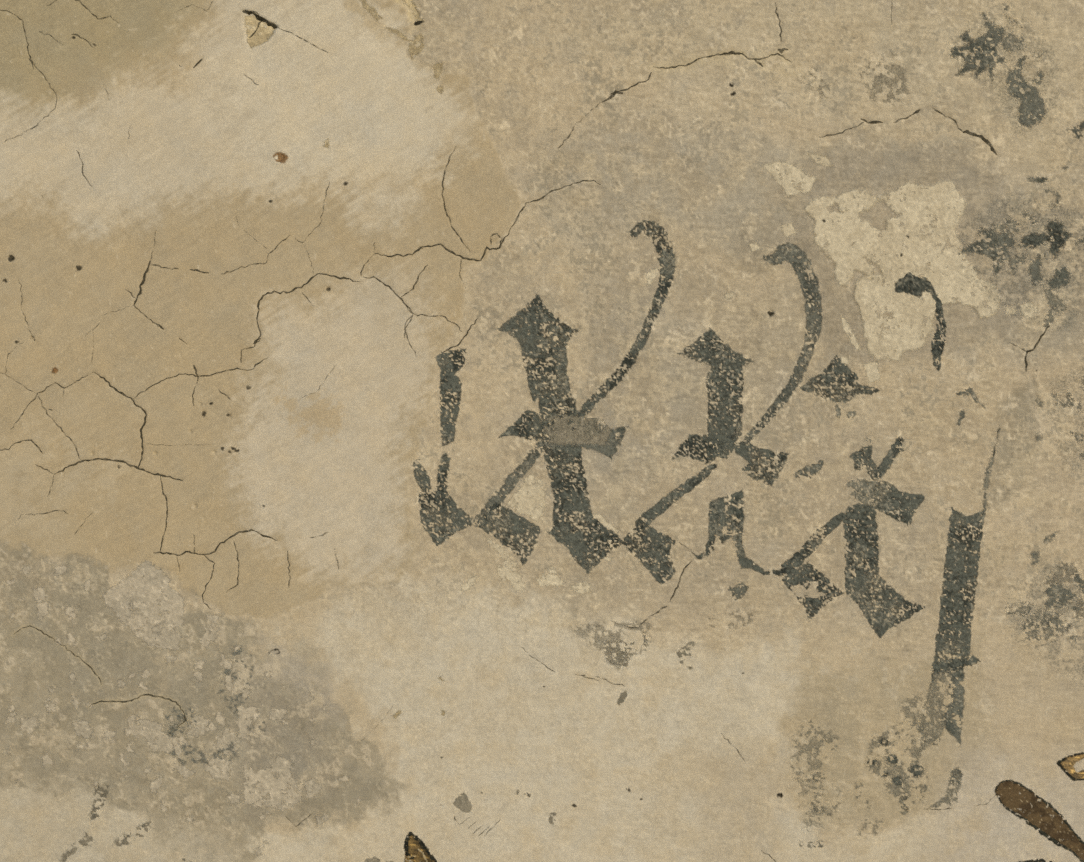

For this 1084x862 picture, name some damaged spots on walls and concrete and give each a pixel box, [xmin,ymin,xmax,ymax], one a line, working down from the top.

crack [242,10,327,52]
spalling [360,0,424,59]
crack [1,0,106,130]
peeling [762,151,1038,384]
crack [1,153,601,609]
leakage [90,786,108,820]
leakage [61,833,93,862]
leakage [116,822,149,846]